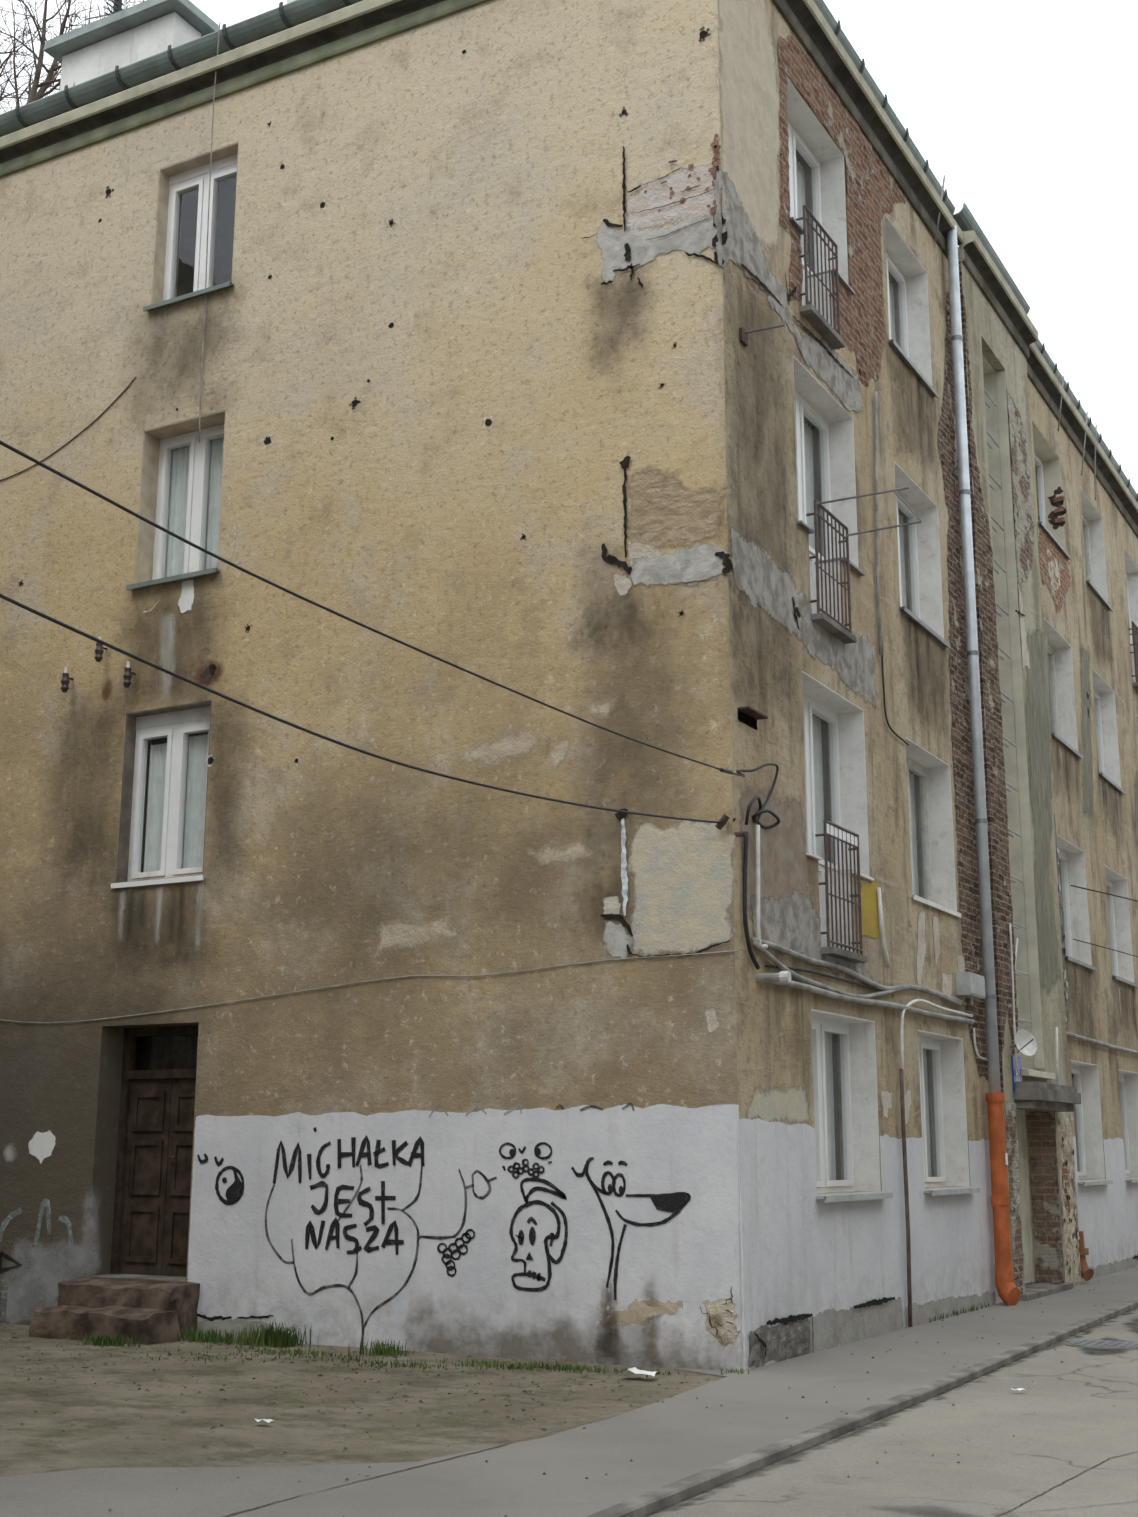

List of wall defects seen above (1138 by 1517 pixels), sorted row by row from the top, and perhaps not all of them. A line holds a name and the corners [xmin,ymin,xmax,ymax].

peeling [601,263,643,288]
spalling [626,133,728,265]
spalling [777,35,907,387]
crack [601,456,632,575]
spalling [613,467,733,596]
spalling [917,261,1082,1299]
spalling [603,820,735,961]
spalling [596,1287,740,1347]